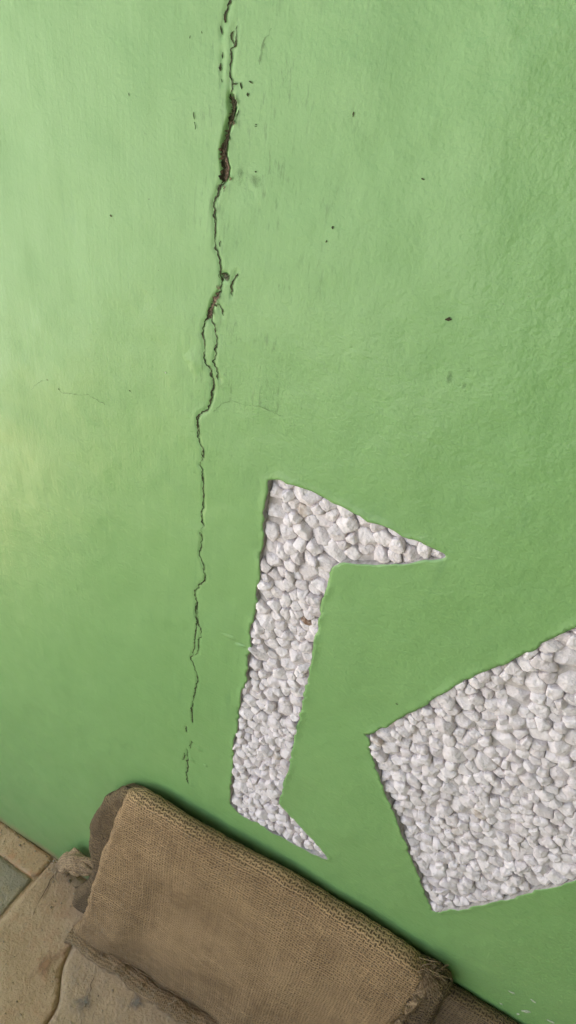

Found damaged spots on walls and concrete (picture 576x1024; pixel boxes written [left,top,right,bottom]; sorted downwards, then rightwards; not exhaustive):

crack [182,0,257,781]